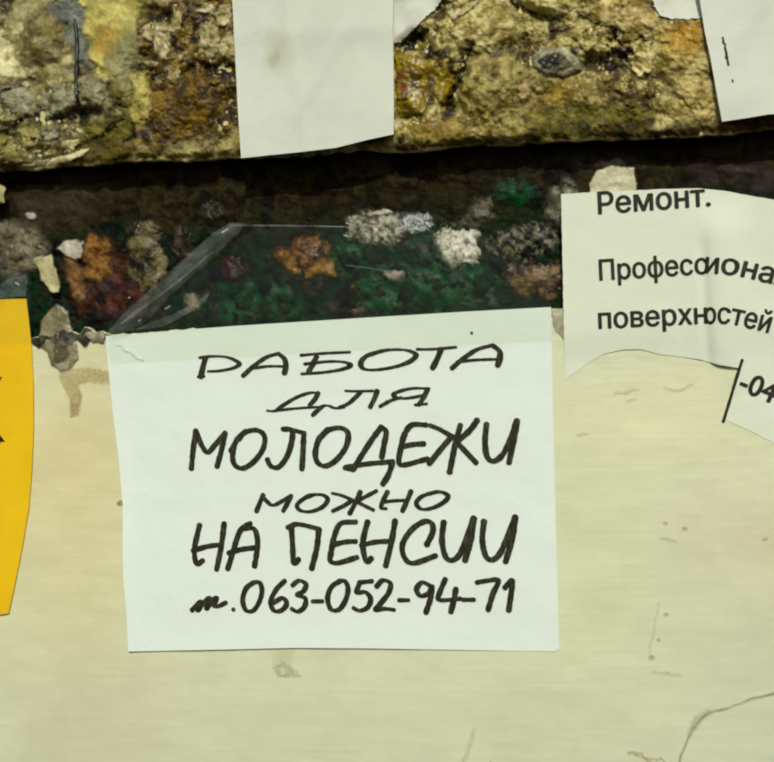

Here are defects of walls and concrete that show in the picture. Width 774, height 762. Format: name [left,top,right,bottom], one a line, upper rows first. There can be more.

leakage [0,0,25,16]
leakage [51,0,90,67]
spalling [0,0,241,168]
spalling [393,0,736,151]
leakage [81,136,134,164]
peeling [589,166,636,192]
leakage [345,209,433,247]
peeling [34,255,60,292]
peeling [58,240,83,259]
leakage [385,270,403,280]
spalling [433,181,578,339]
crack [680,708,728,758]